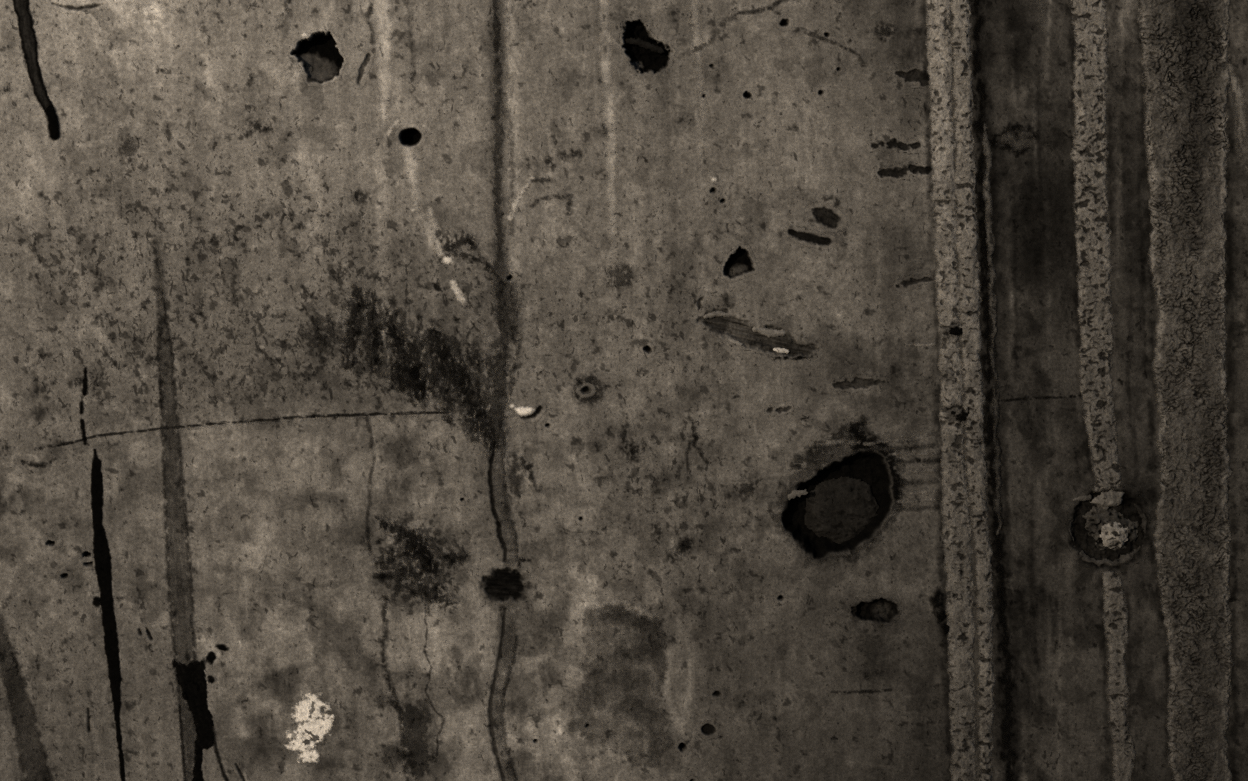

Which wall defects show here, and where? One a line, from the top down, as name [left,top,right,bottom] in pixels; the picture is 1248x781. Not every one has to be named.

spalling [273,7,374,90]
spalling [618,16,676,80]
spalling [718,243,759,283]
spalling [689,291,828,362]
crack [484,279,540,568]
crack [21,411,449,550]
peeling [787,489,808,500]
spalling [848,592,903,628]
crack [484,601,517,781]